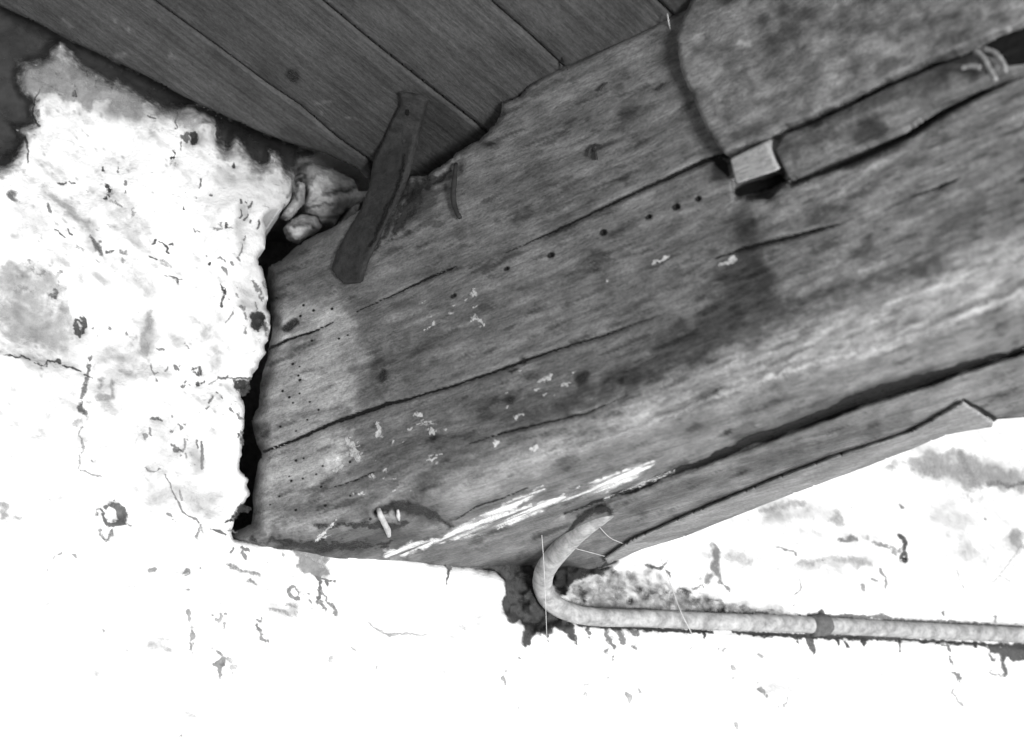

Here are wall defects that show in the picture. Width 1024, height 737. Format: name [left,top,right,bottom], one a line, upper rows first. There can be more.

spalling [220,280,268,336]
spalling [233,380,250,396]
crack [263,318,652,453]
spalling [874,534,908,563]
spalling [554,566,801,616]